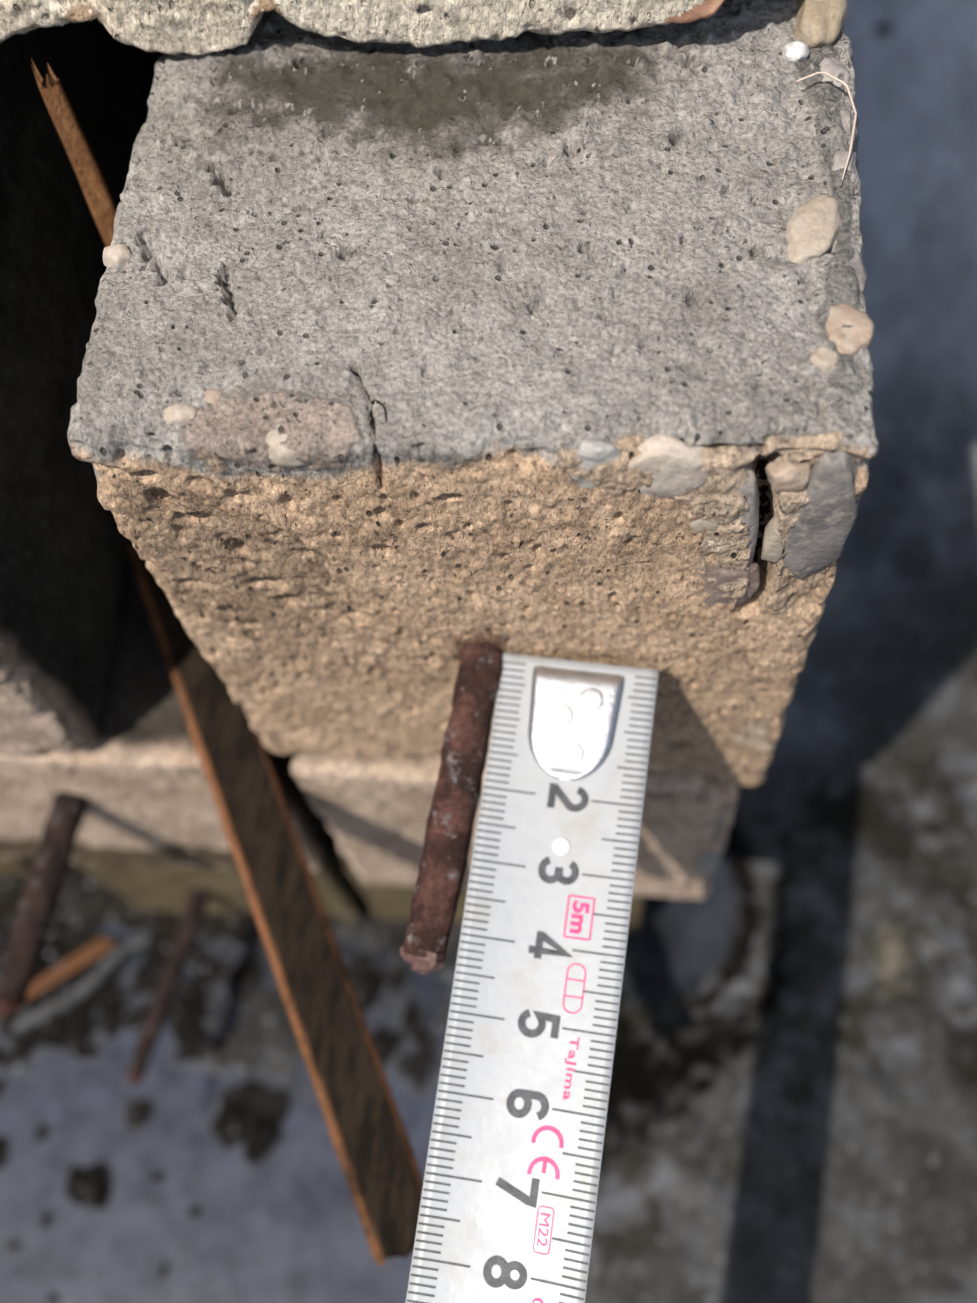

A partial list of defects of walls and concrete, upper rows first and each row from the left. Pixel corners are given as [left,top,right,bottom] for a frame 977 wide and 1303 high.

crack [357,373,387,486]
spalling [556,431,871,614]